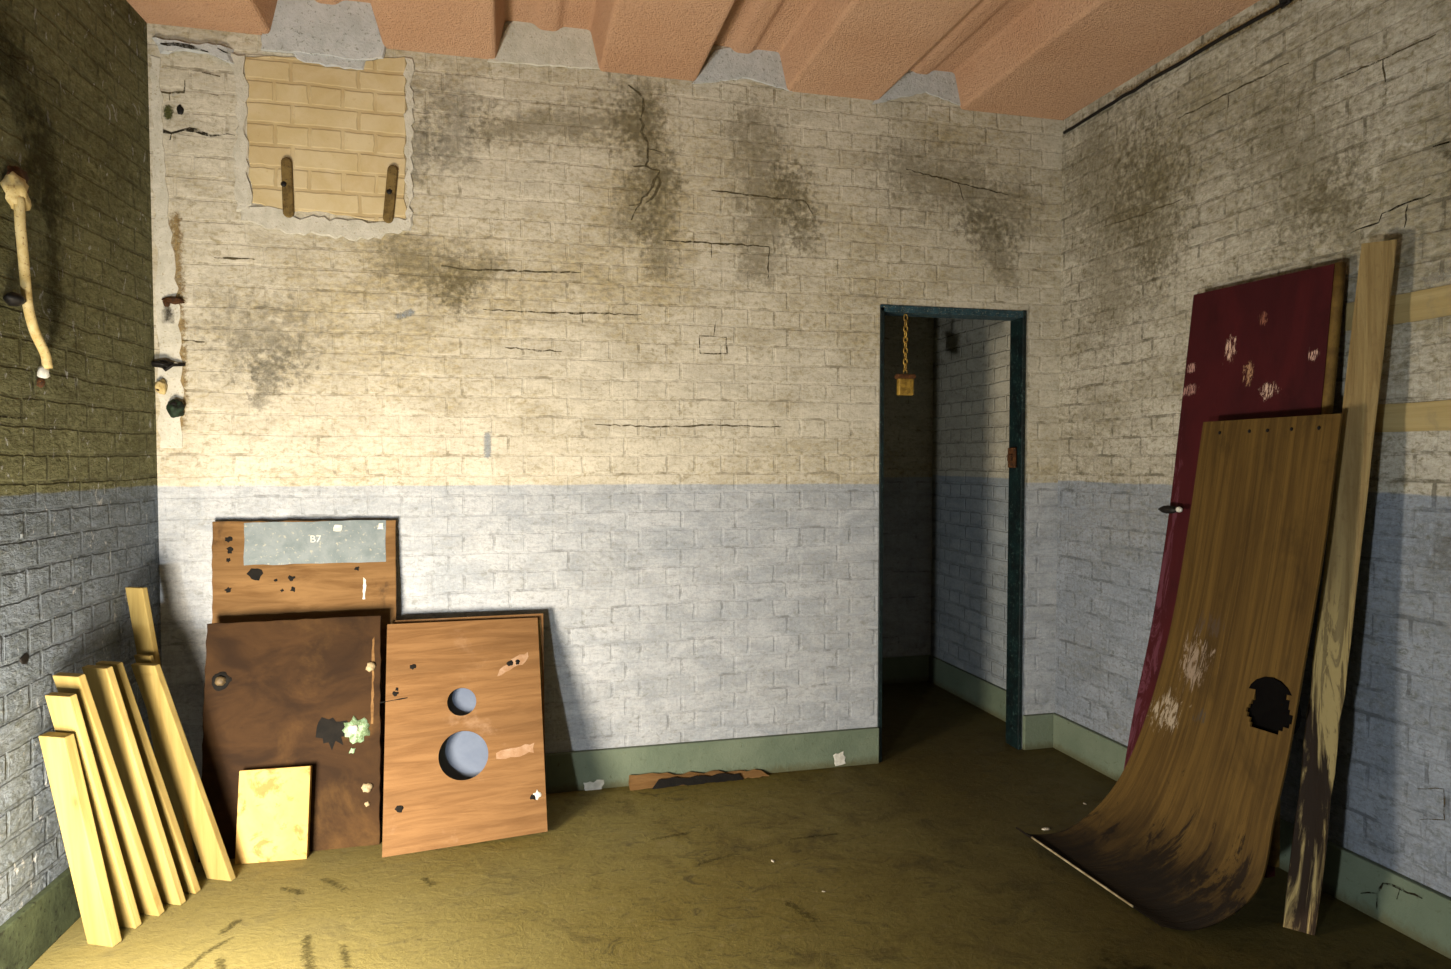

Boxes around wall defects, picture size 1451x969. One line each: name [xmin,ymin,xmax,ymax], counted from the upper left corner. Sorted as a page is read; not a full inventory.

leakage [0,24,69,331]
peeling [228,52,415,241]
crack [1351,194,1431,233]